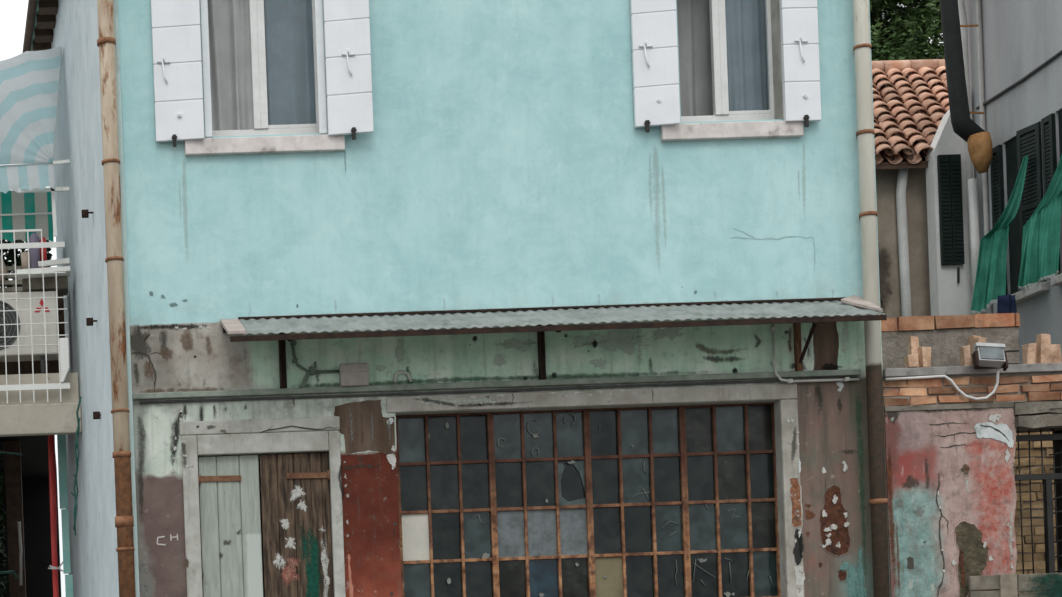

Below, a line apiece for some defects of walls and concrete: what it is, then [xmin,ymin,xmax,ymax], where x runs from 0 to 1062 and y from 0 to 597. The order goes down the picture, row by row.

crack [732,228,815,272]
water stain [878,250,892,307]
water stain [130,327,187,393]
peeling [332,399,397,499]
peeling [974,414,1015,474]
flaking render [786,419,866,597]
flaking render [952,520,993,597]